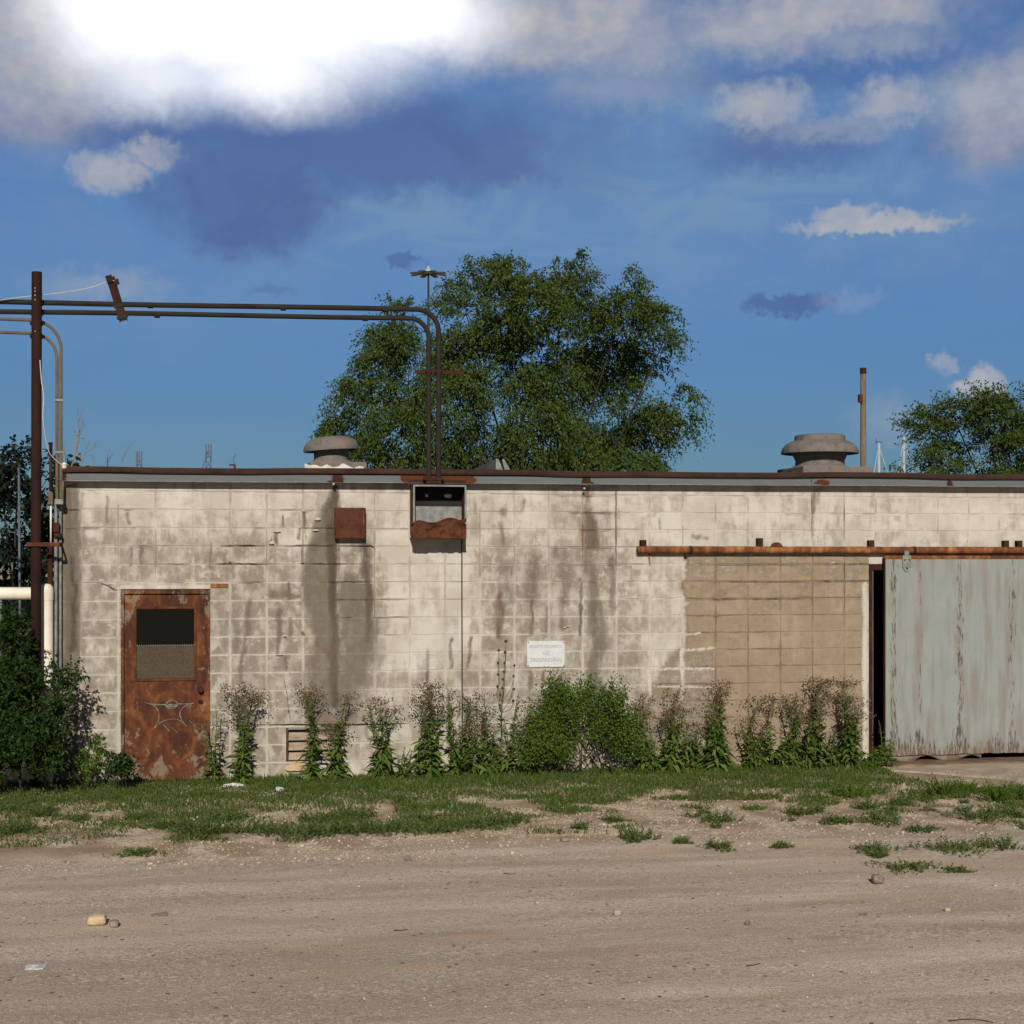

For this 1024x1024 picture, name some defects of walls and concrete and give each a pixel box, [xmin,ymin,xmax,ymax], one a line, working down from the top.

leakage [585,512,599,557]
leakage [304,484,376,726]
leakage [579,570,605,687]